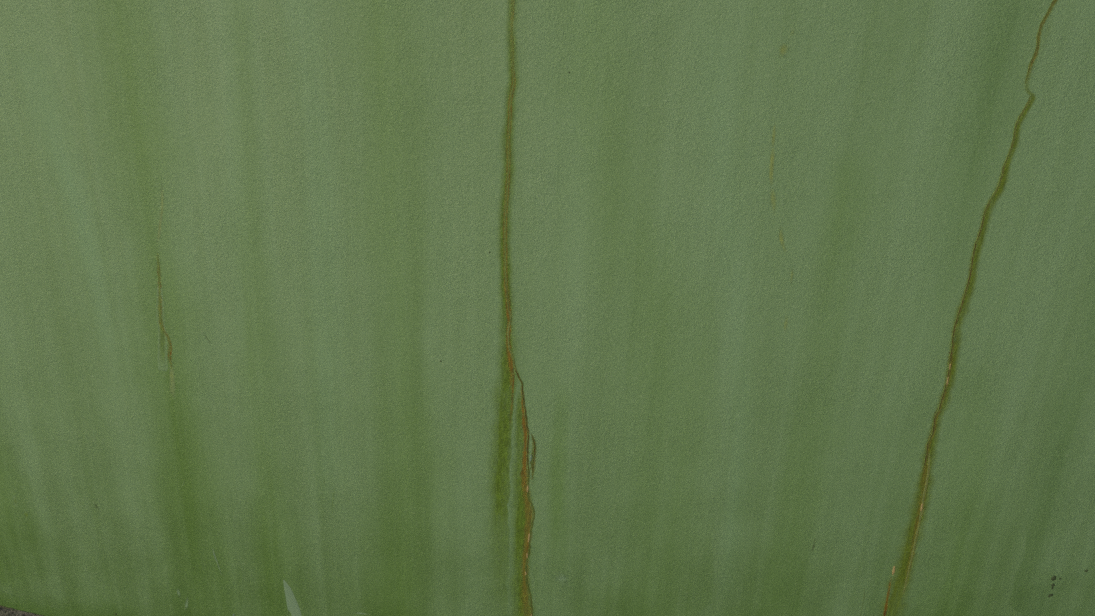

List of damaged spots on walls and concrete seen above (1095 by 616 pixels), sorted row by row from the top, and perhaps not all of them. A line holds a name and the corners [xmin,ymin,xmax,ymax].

crack [156,185,175,399]
damp [71,0,477,616]
crack [479,0,552,616]
damp [527,0,885,616]
crack [873,0,1061,616]
damp [908,0,1052,318]
damp [908,238,1095,616]